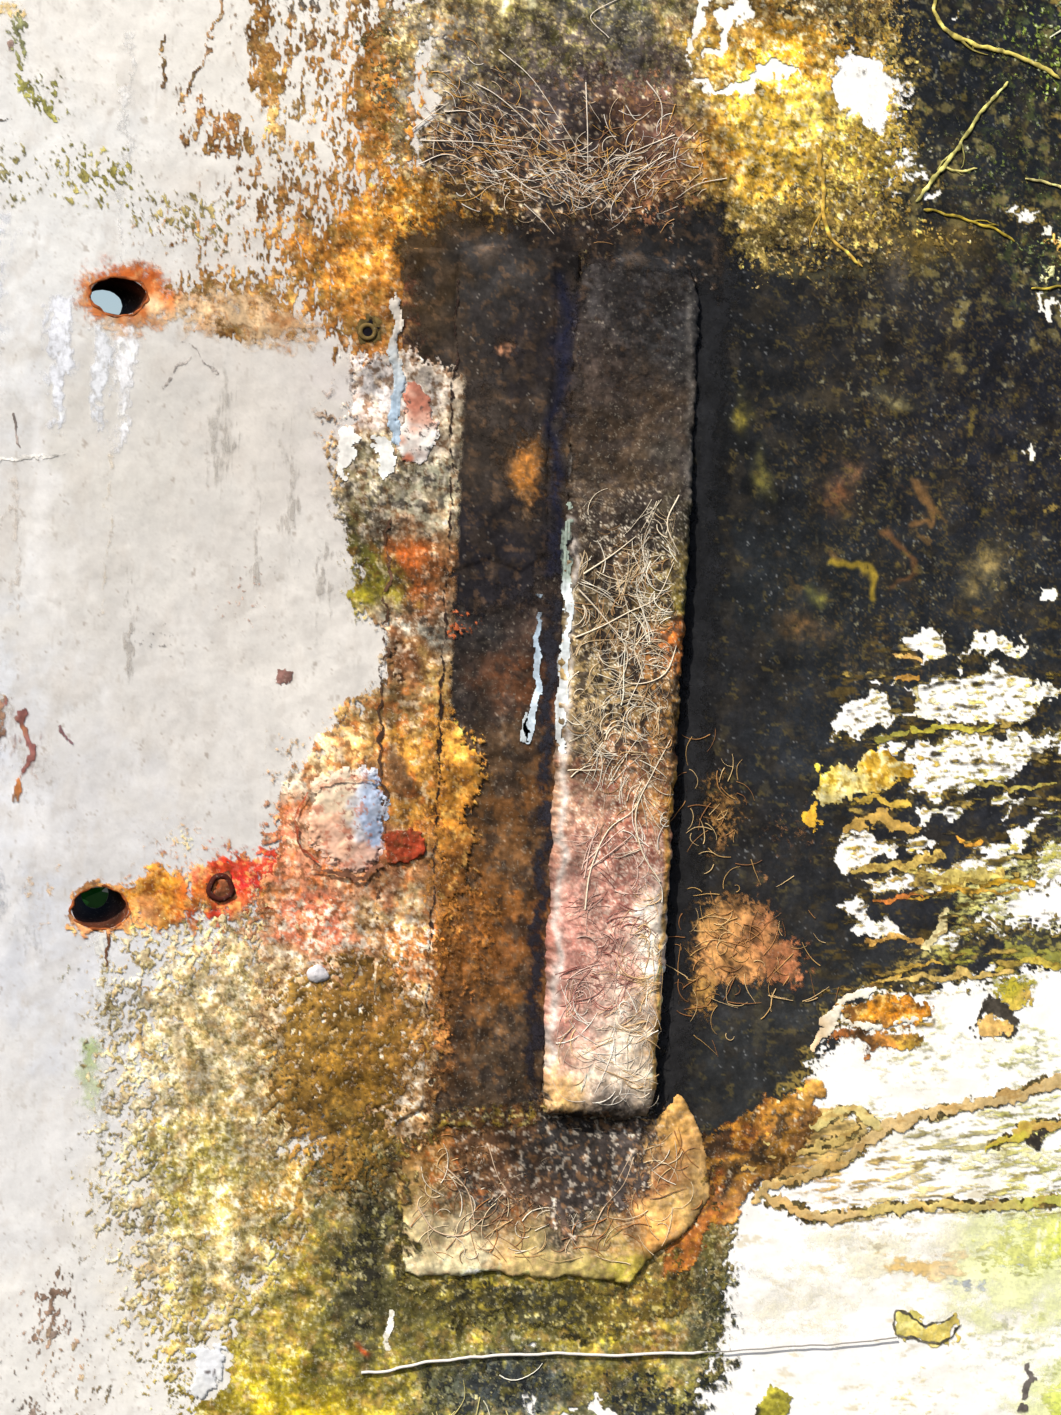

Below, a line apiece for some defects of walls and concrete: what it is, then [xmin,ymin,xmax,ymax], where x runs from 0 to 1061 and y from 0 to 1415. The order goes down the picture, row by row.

peeling [336,292,440,481]
rust [65,0,506,1152]
leakage [392,0,1061,1241]
rust [0,696,36,802]
peeling [801,801,823,833]
peeling [11,1258,122,1415]
leakage [332,1154,396,1351]
leakage [411,1323,583,1415]
leakage [603,1265,742,1415]
rust [663,1079,827,1278]
spalling [892,1310,961,1347]
peeling [1017,1363,1037,1412]